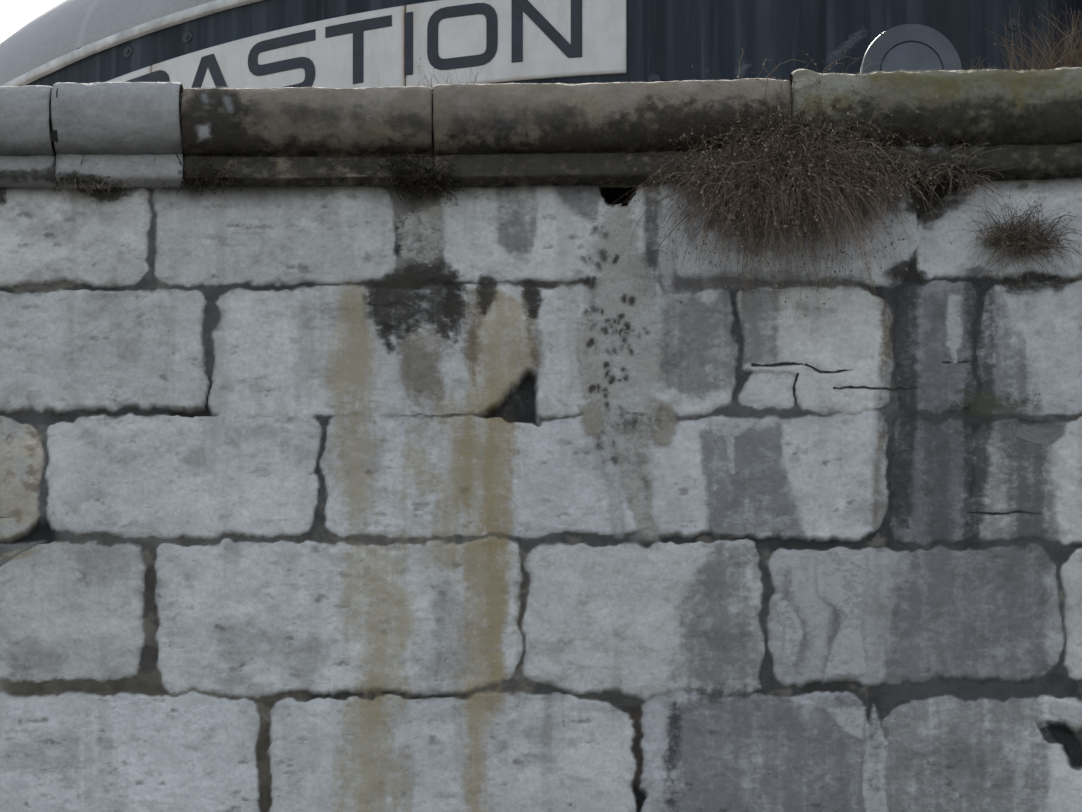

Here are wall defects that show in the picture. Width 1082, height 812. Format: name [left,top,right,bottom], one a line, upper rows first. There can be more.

leakage [181,87,1082,546]
spalling [484,374,537,425]
crack [751,362,922,404]
spalling [1040,701,1082,769]